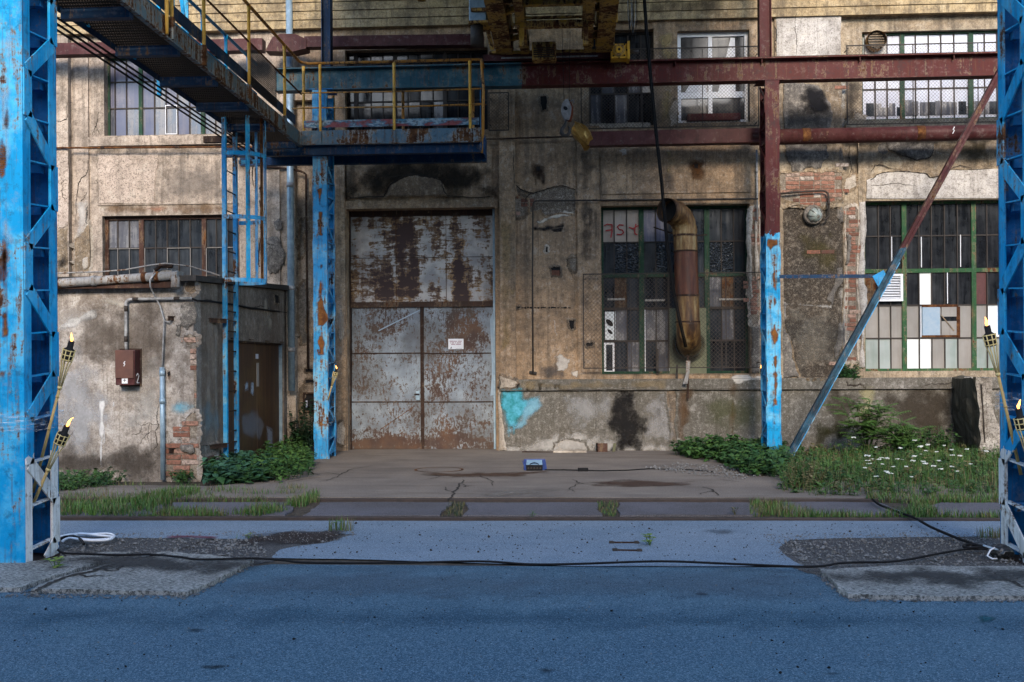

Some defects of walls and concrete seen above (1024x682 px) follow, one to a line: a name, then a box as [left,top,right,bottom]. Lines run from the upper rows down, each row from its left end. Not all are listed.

flaking render [515,183,578,220]
corrosion [0,240,8,280]
flaking render [780,142,998,382]
corrosion [317,281,328,355]
flaking render [165,281,222,482]
damp [505,400,672,451]
crack [420,472,512,499]